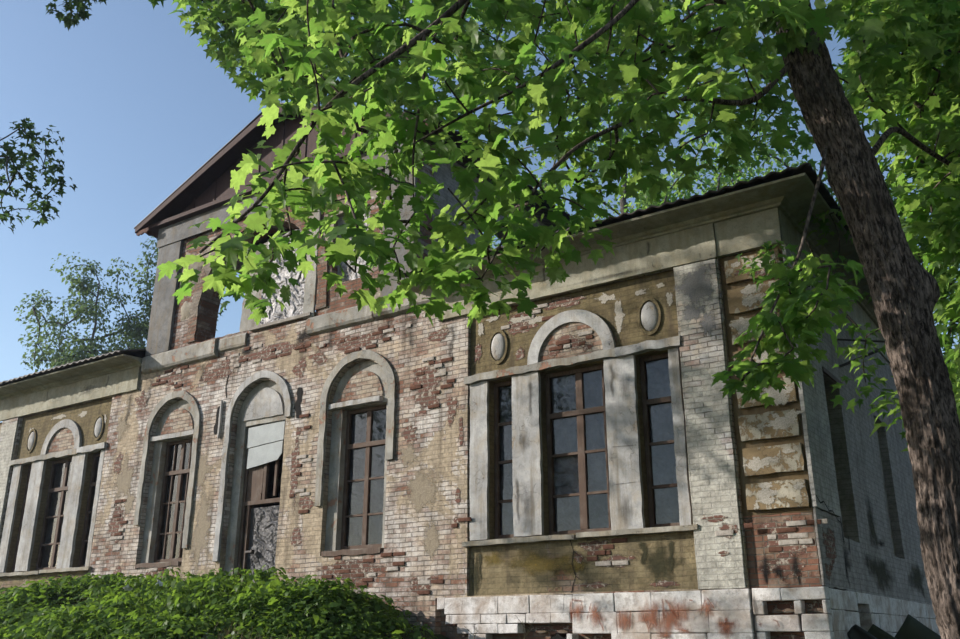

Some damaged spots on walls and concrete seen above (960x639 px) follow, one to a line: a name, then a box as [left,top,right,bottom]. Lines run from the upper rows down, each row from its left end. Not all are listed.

flaking render [474,292,625,363]
peeling [760,375,803,430]
flaking render [399,356,463,514]
flaking render [108,452,135,551]
crack [570,540,583,593]
leakage [639,541,675,582]
flaking render [701,515,837,581]
leakage [866,502,892,590]
leakage [909,566,924,595]
rust [570,599,603,628]
rust [619,598,714,637]
rust [719,618,732,634]